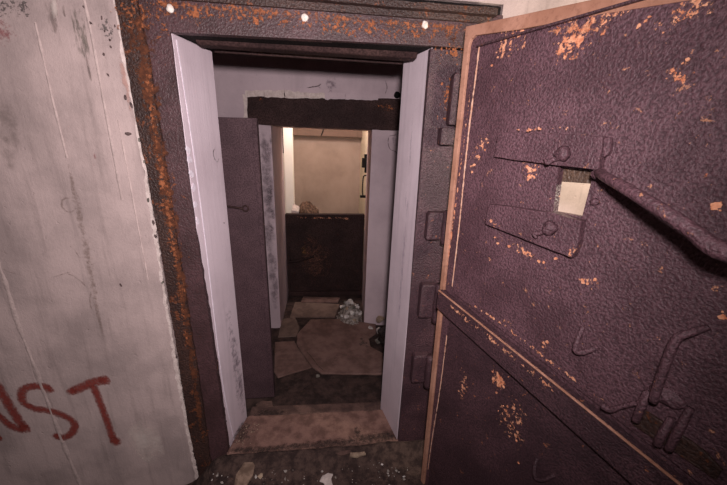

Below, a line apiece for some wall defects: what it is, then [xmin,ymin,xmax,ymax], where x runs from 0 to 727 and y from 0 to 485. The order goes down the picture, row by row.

corrosion [115,0,466,438]